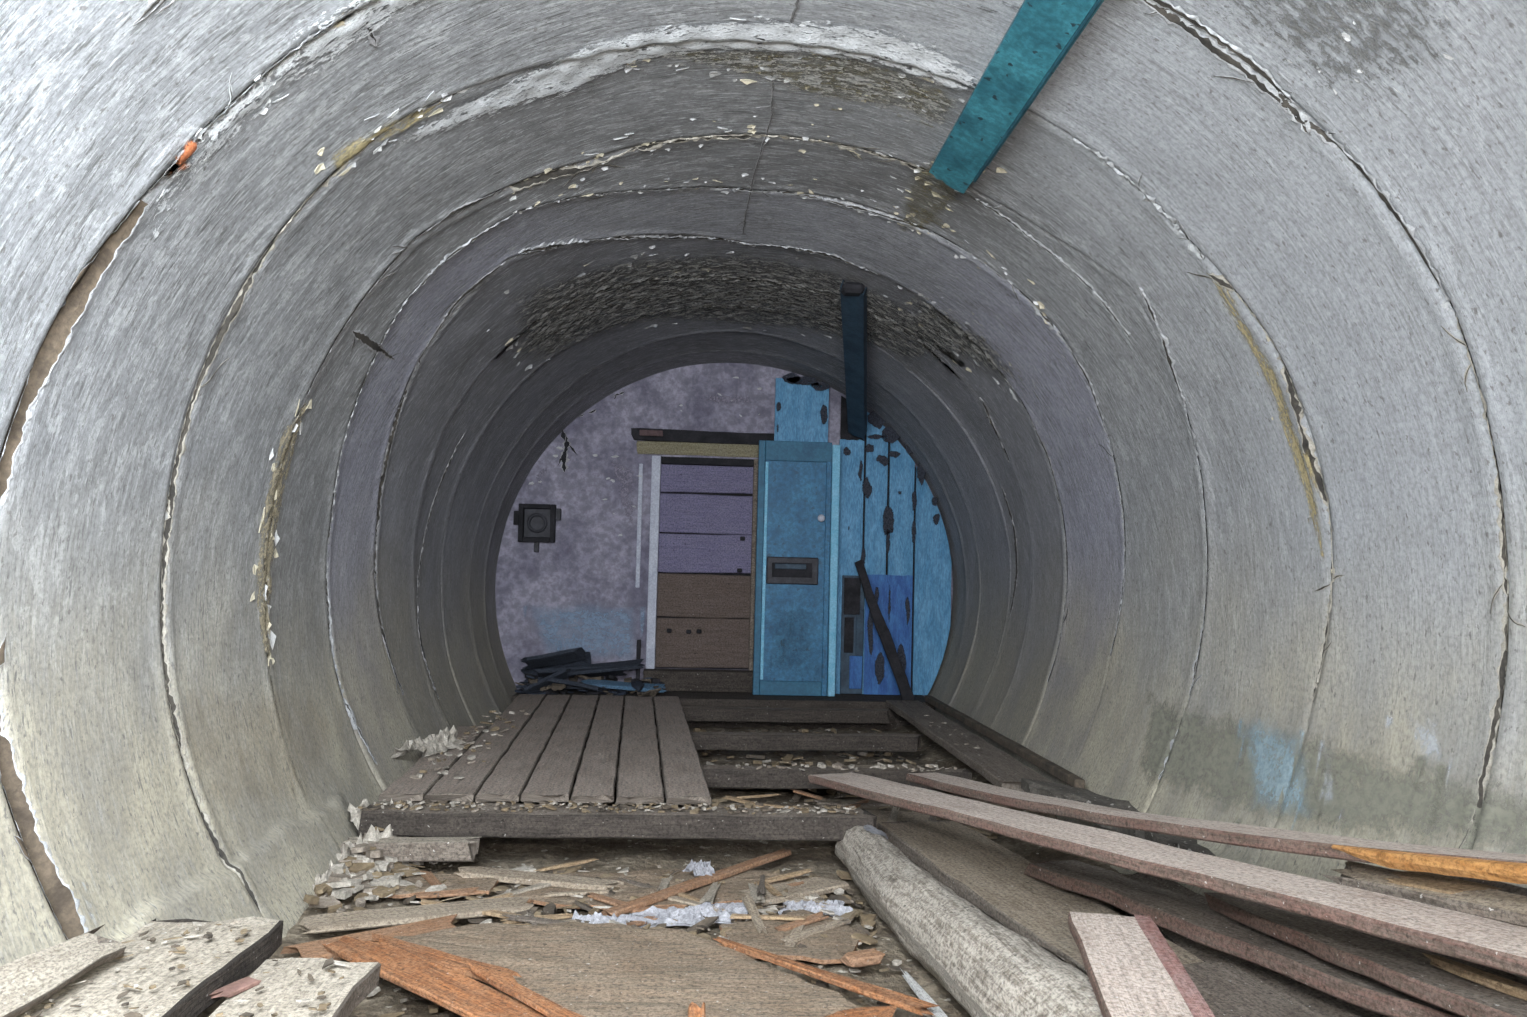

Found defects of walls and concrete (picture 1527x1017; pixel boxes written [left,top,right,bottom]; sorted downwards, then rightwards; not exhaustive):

corrosion [177,141,198,167]
crack [0,0,380,511]
crack [160,140,368,912]
peeling [250,399,312,666]
peeling [144,0,429,249]
peeling [314,16,977,176]
crack [263,0,1212,780]
peeling [487,245,1038,403]
crack [1073,138,1344,702]
crack [1137,0,1525,849]
crack [0,633,88,940]
water stain [1144,706,1527,850]